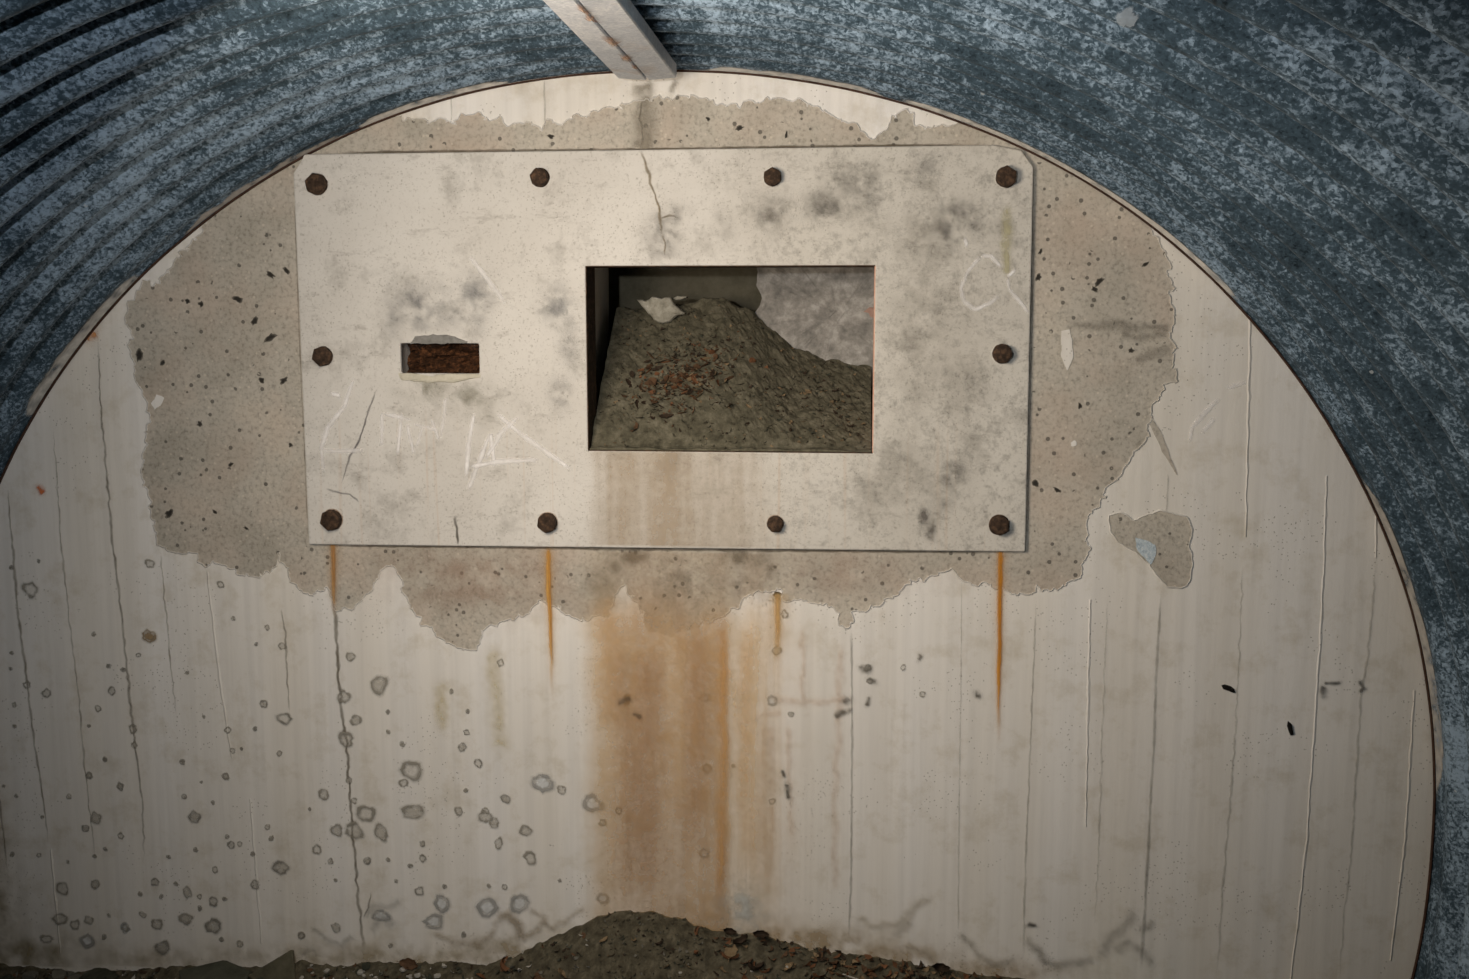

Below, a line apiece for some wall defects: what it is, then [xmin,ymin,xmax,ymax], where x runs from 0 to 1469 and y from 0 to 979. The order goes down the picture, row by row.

crack [639,107,667,251]
peeling [124,94,1194,651]
crack [335,618,357,884]
corrosion [599,615,730,931]